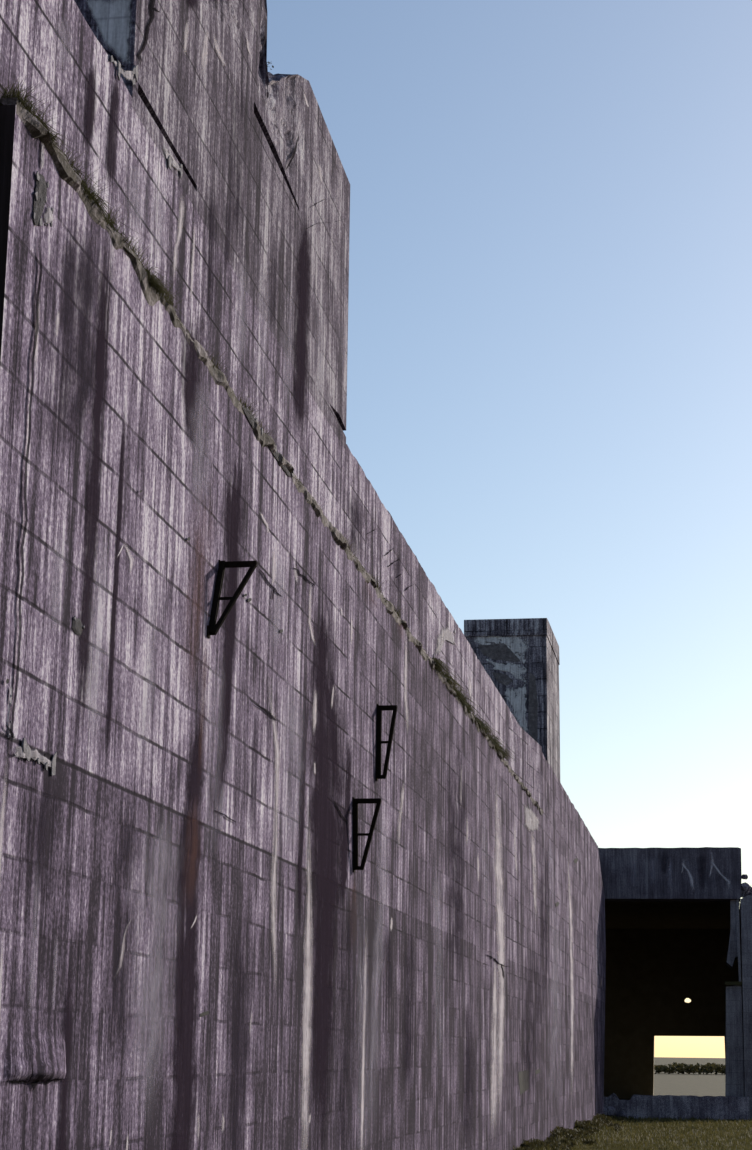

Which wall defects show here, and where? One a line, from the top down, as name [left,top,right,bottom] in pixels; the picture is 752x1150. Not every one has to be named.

leakage [85,69,96,145]
peeling [87,0,138,85]
leakage [107,83,120,180]
leakage [174,206,195,293]
leakage [182,323,203,440]
leakage [288,222,311,421]
leakage [56,246,133,744]
spalling [474,636,538,743]
leakage [170,462,242,1150]
leakage [272,595,352,1142]
leakage [491,803,504,1117]
leakage [58,973,73,1150]